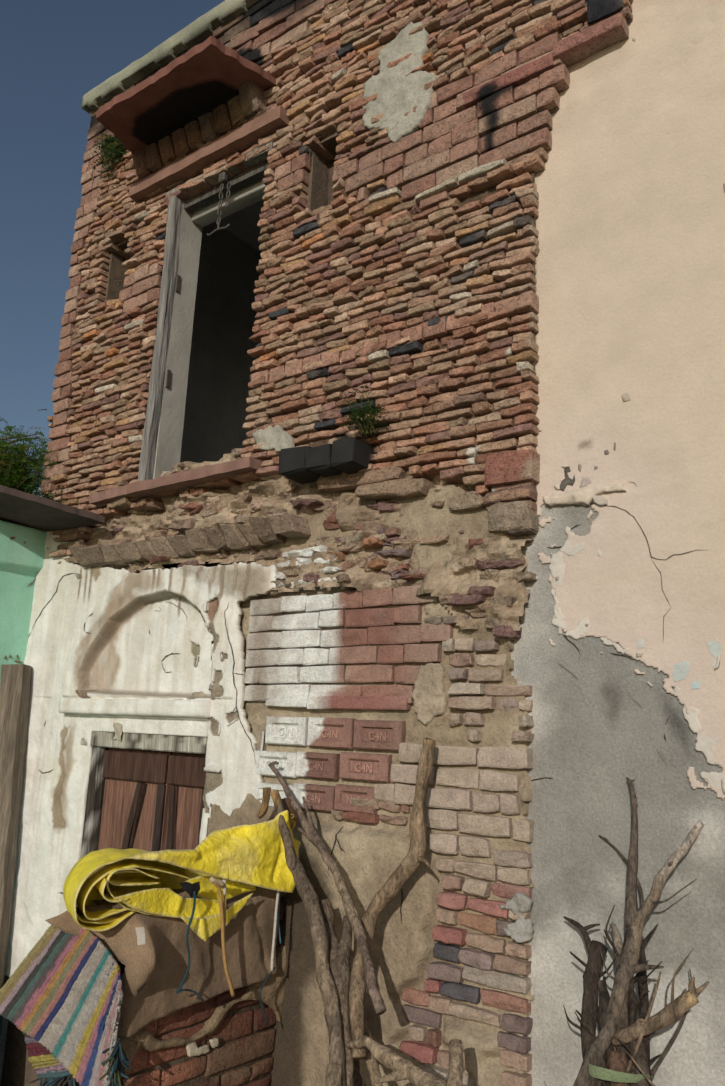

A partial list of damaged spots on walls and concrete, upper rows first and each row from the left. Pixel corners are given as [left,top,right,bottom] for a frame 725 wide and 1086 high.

peeling [62,448,725,1086]
crack [612,506,696,637]